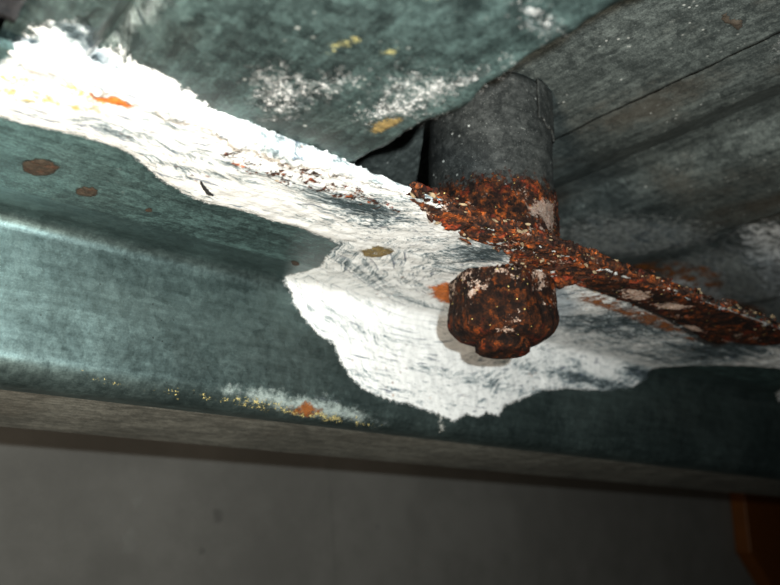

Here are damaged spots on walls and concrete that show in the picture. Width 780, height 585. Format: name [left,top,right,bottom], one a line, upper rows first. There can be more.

leakage [0,75,106,115]
leakage [375,78,445,117]
rust [0,19,780,422]
leakage [360,246,394,257]
leakage [220,397,342,423]